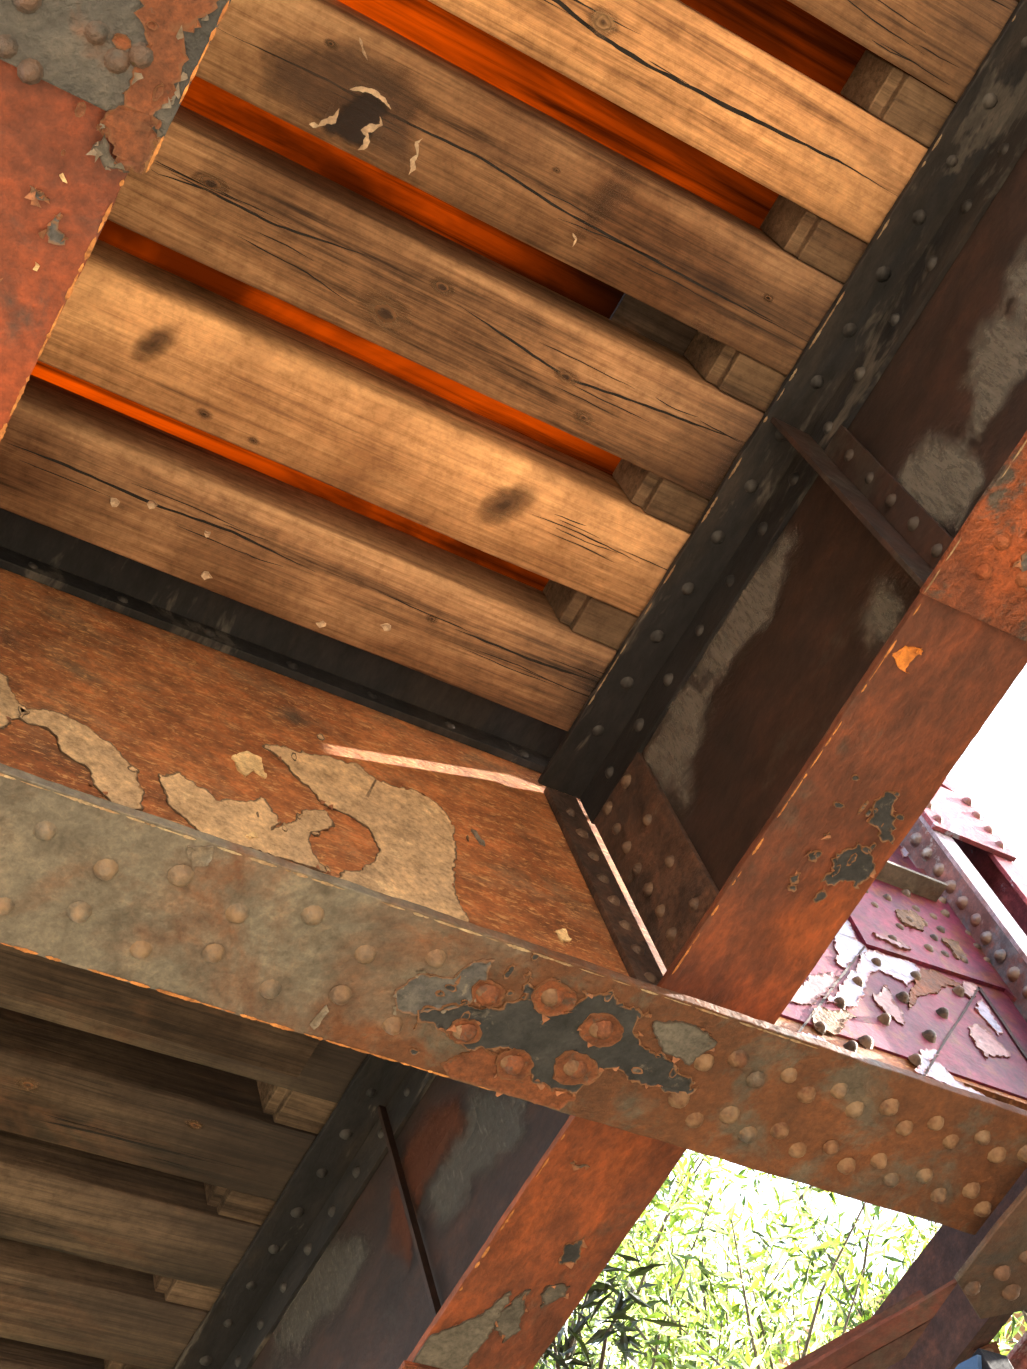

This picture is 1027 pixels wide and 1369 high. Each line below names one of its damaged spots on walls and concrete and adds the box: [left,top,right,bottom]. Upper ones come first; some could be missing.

rust [75,0,229,186]
crack [544,0,897,196]
rust [37,202,113,359]
rust [0,377,29,440]
rust [861,640,923,692]
peeling [0,672,486,922]
peeling [393,953,717,1096]
peeling [790,920,920,1026]
rust [908,967,962,1010]
peeling [914,1049,985,1096]
peeling [962,981,1011,1059]
peeling [412,1236,587,1369]